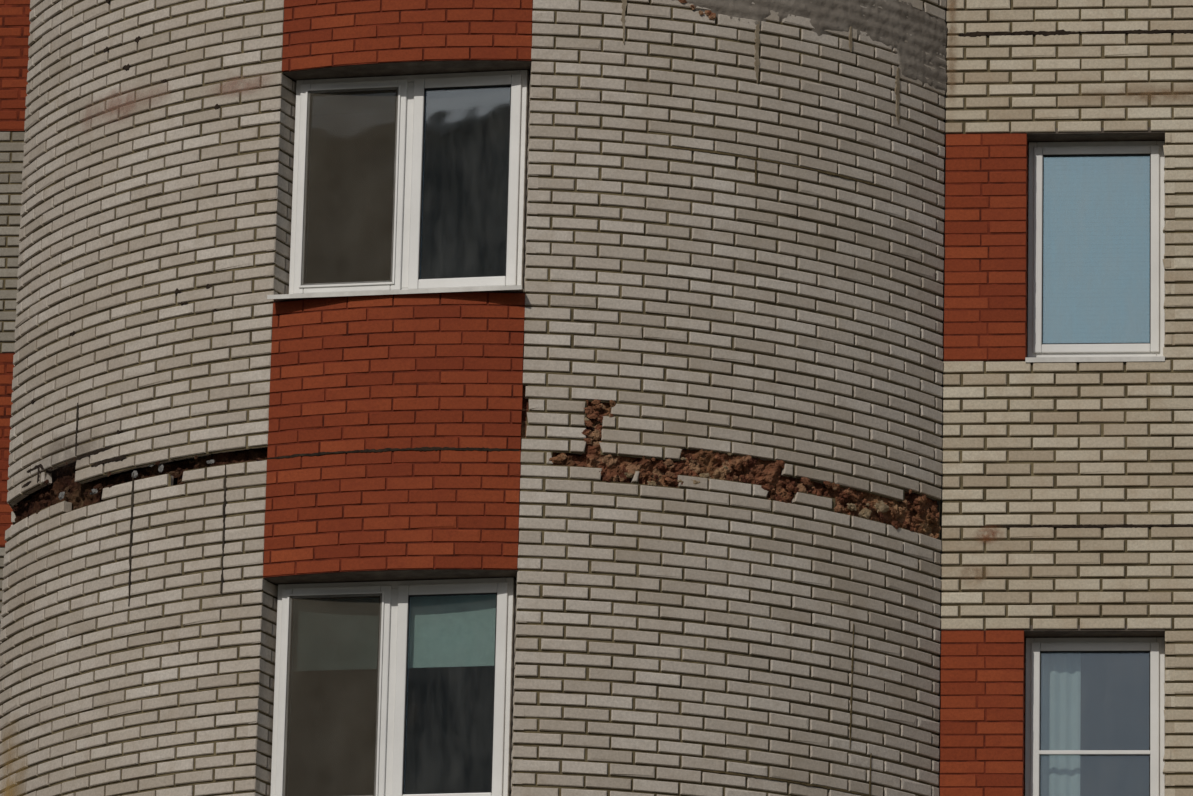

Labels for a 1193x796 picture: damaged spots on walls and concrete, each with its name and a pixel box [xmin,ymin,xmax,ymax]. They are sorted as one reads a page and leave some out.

spalling [13,446,268,523]
spalling [549,399,941,539]